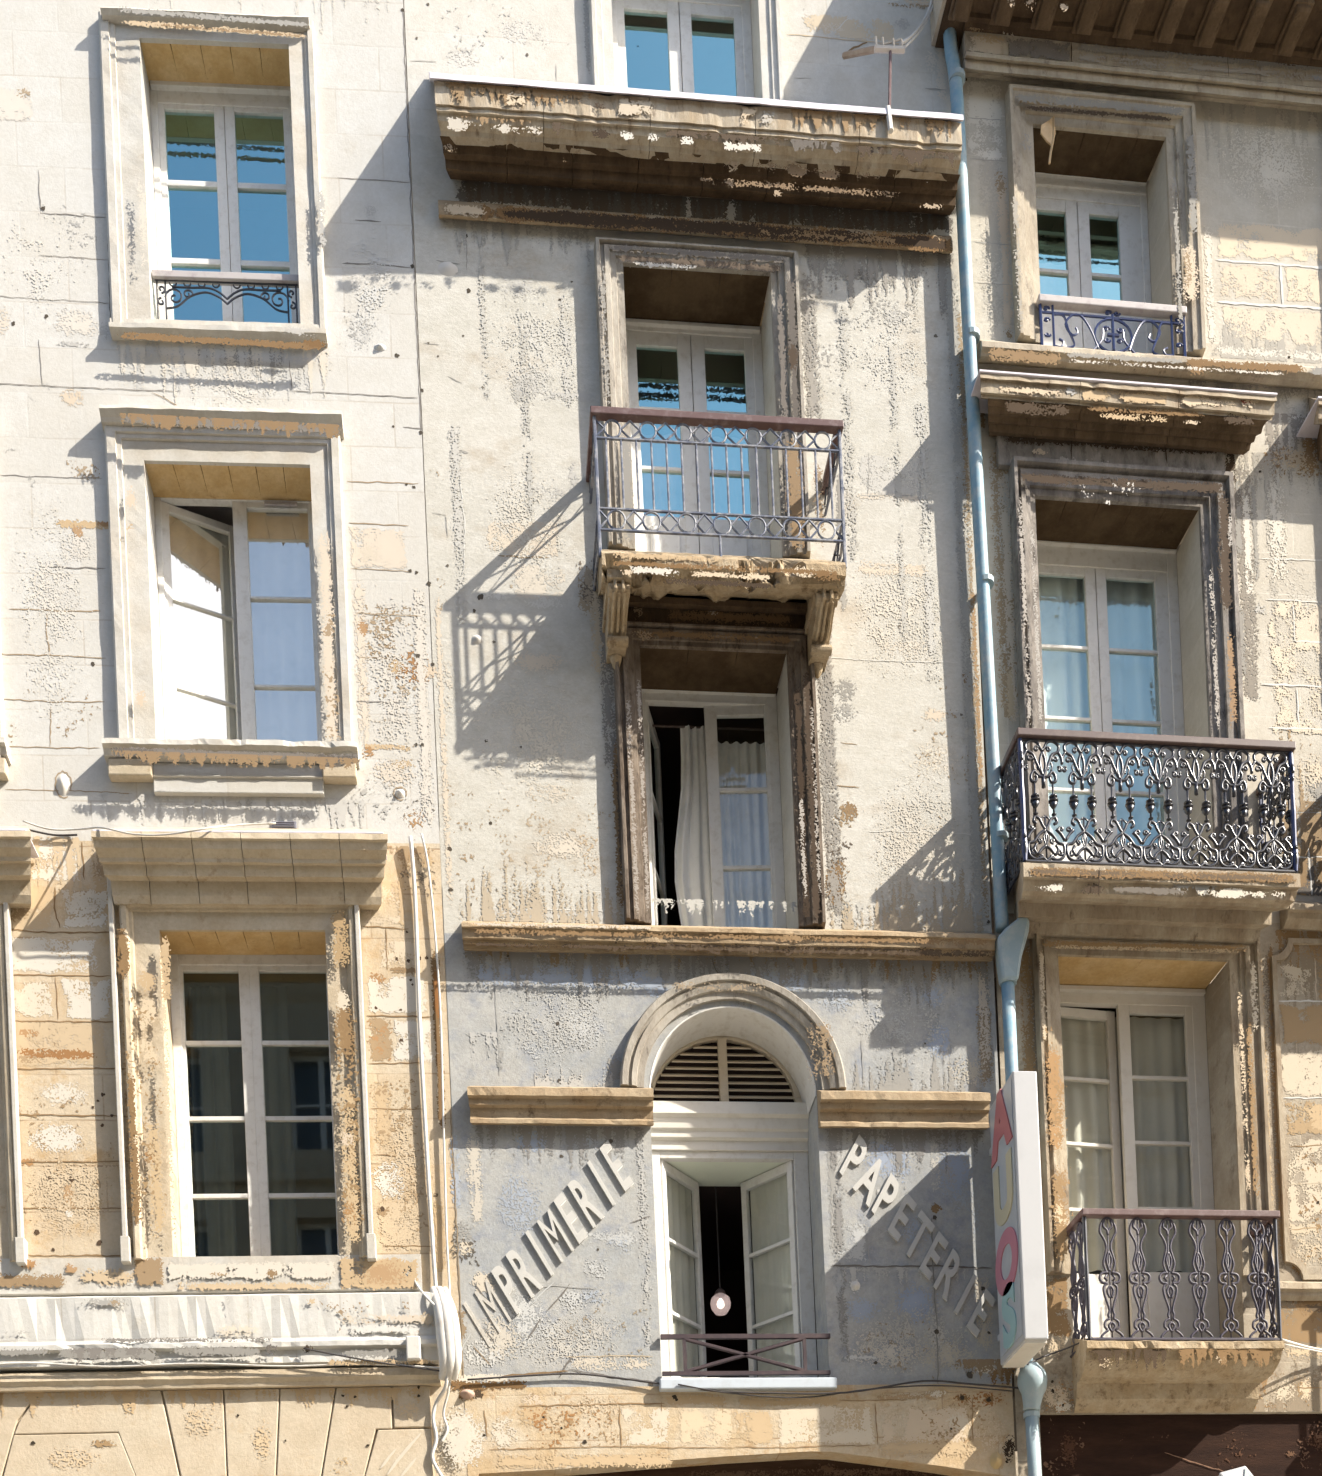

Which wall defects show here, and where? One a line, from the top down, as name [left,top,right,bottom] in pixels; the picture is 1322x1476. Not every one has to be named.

water stain [595,228,962,689]
water stain [478,952,992,1089]
spalling [24,1094,114,1217]
spalling [519,1391,626,1451]
peeling [685,1394,996,1476]